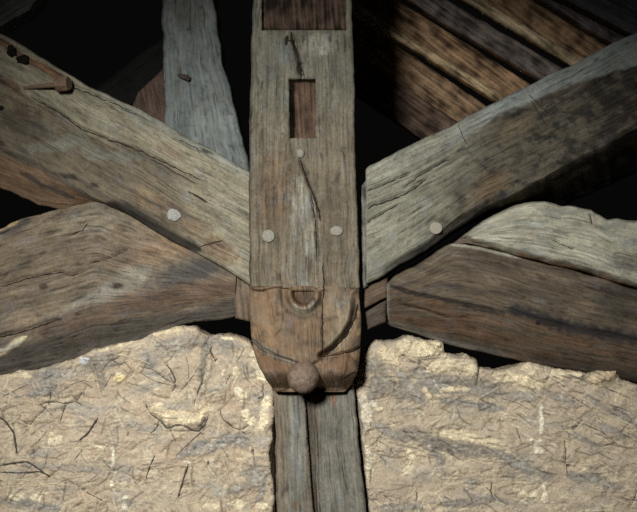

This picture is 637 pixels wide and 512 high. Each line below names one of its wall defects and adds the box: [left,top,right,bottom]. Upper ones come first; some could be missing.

crack [285,32,304,80]
crack [300,160,359,358]